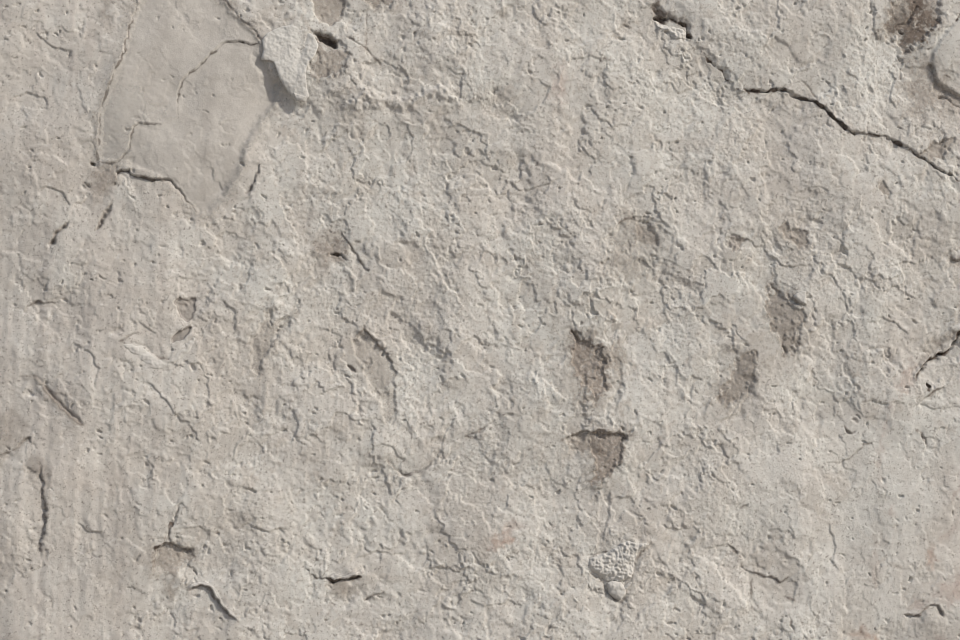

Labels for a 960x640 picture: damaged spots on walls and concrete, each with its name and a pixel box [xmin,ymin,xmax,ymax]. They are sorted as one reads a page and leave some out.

spalling [887,0,941,54]
peeling [91,0,346,216]
crack [706,57,958,181]
spalling [766,284,807,355]
spalling [568,329,625,402]
spalling [718,354,754,403]
crack [916,331,960,396]
spalling [571,429,628,485]
crack [316,570,362,584]